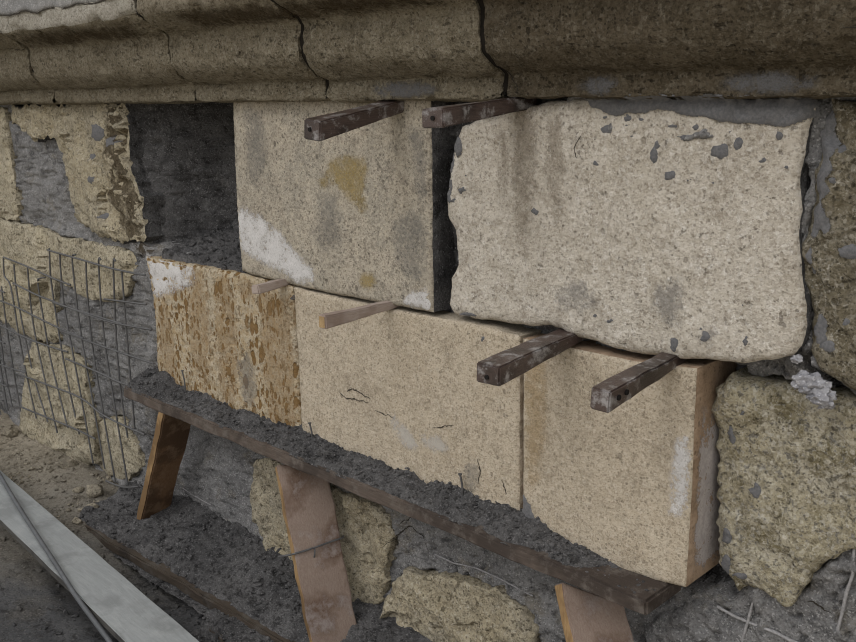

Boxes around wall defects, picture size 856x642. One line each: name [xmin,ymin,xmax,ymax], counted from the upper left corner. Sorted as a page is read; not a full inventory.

crack [0,0,106,17]
crack [265,0,329,94]
crack [477,0,518,97]
damp [103,106,195,296]
damp [238,208,314,284]
crack [340,388,392,418]